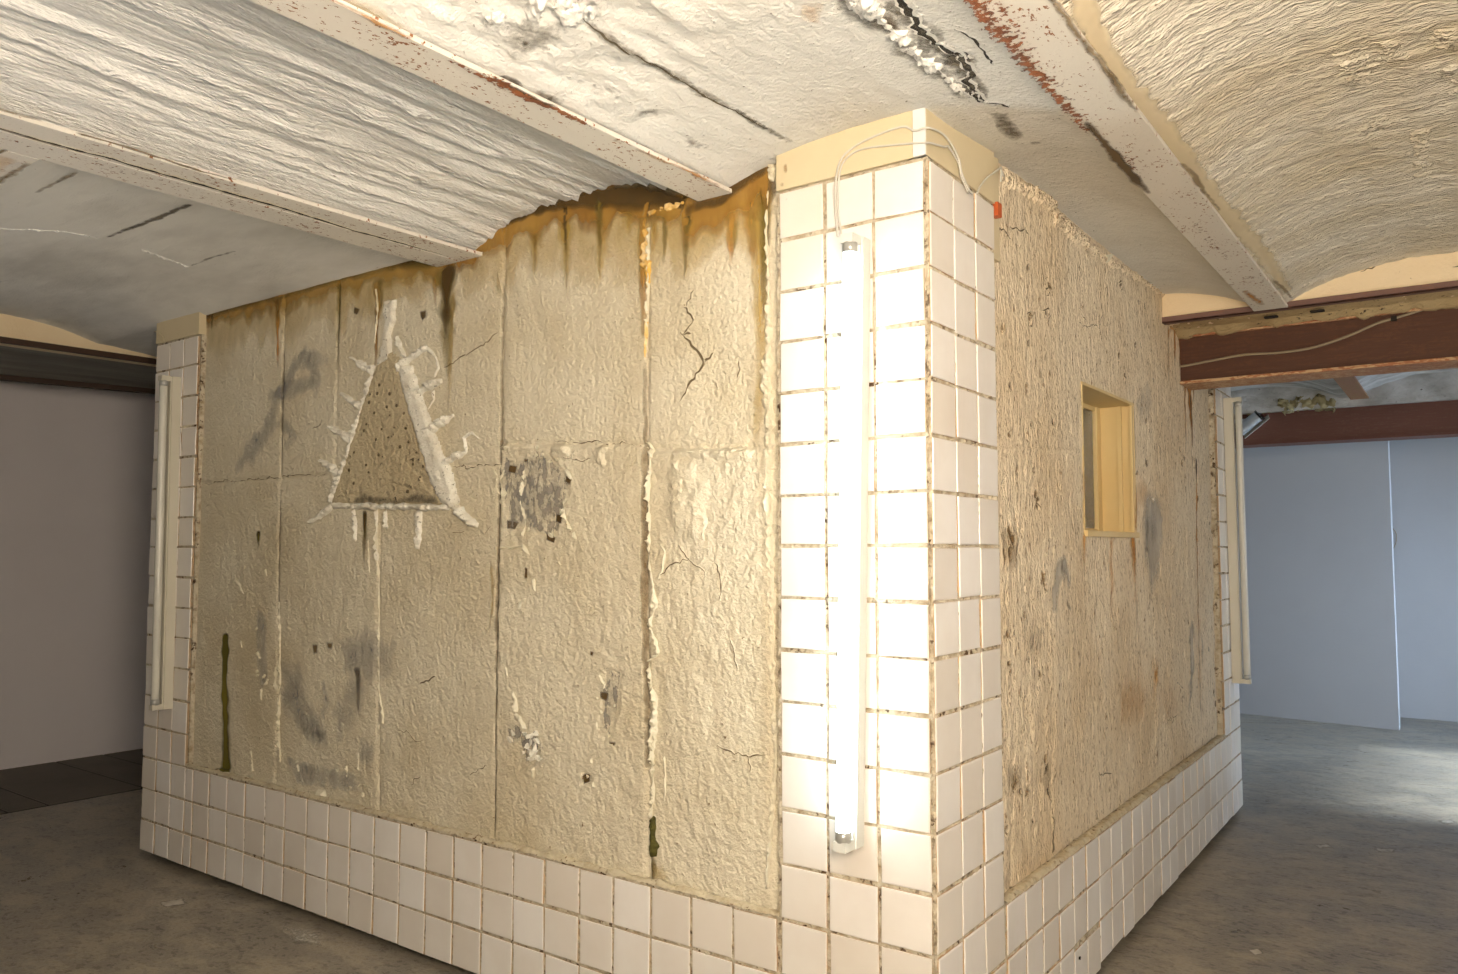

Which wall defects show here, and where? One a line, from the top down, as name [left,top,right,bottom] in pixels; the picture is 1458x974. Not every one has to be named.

corrosion [332,0,407,37]
crack [892,0,1010,108]
corrosion [963,0,1149,193]
corrosion [1181,164,1220,210]
damp [638,201,684,357]
crack [679,290,742,402]
spalling [500,445,577,609]
spalling [505,667,543,778]